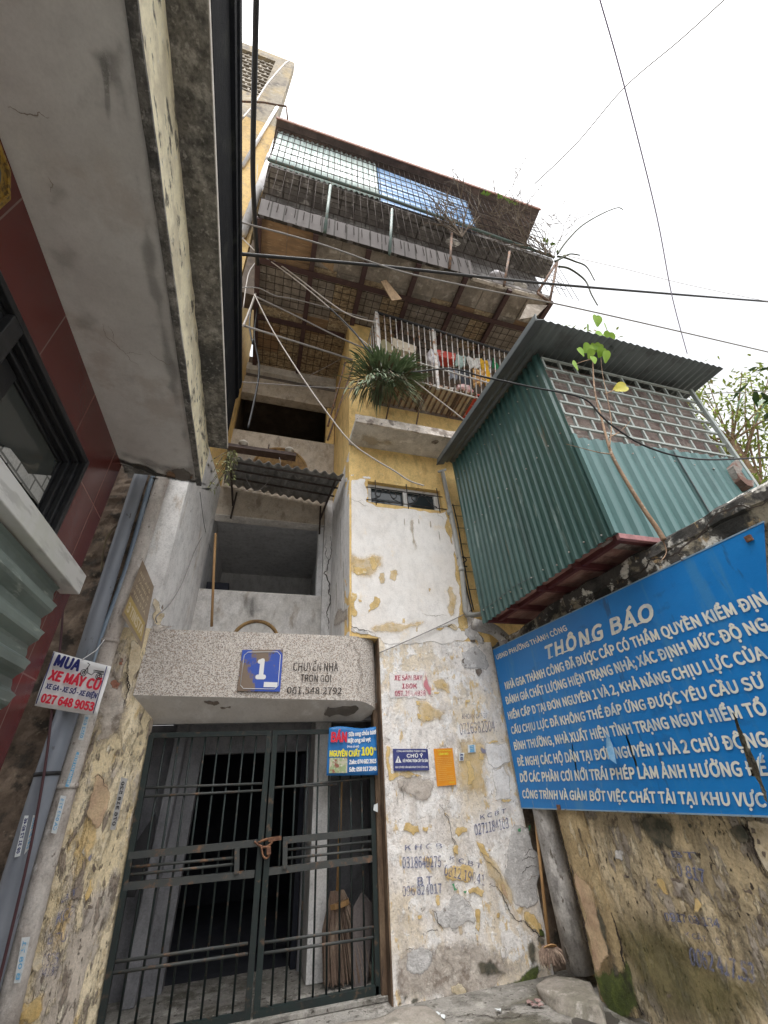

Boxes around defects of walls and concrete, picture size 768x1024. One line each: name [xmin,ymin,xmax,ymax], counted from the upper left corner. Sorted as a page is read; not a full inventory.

crack [324,536,363,694]
peeling [351,593,380,634]
peeling [436,624,489,676]
peeling [416,679,449,722]
peeling [386,746,434,802]
peeling [458,741,486,790]
peeling [404,823,428,835]
water stain [635,815,673,849]
water stain [730,825,749,843]
peeling [418,825,545,937]
water stain [572,1012,619,1024]